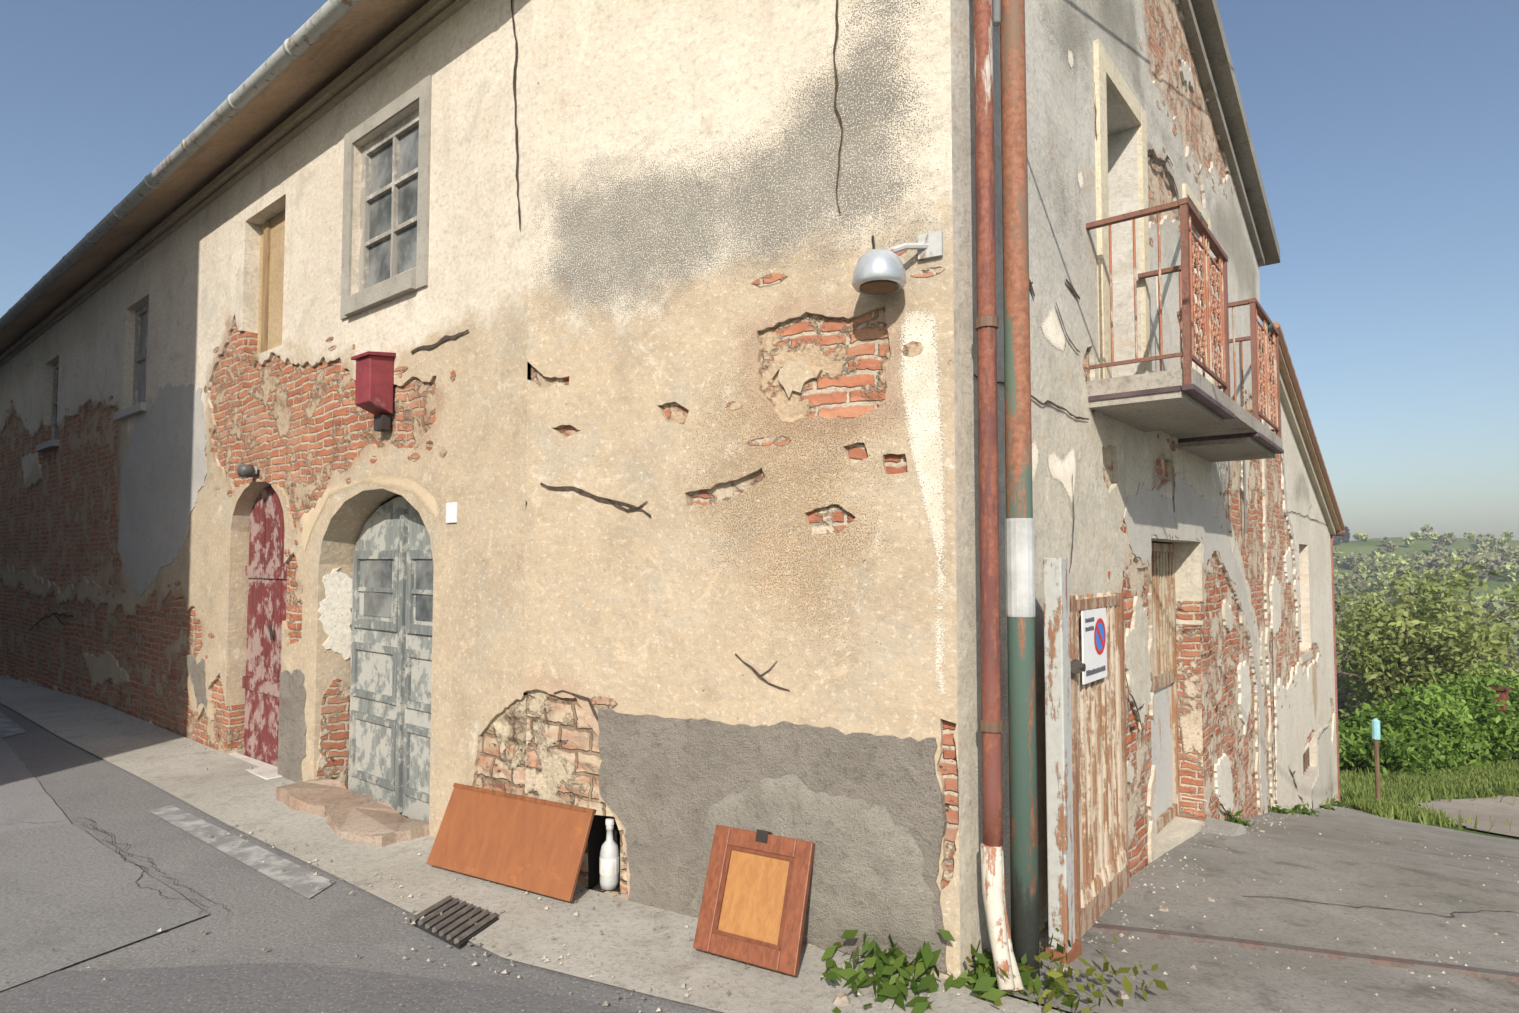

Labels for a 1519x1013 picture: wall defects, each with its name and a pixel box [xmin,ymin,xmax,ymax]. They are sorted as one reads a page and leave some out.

flaking render [1139,0,1236,246]
flaking render [0,392,245,751]
flaking render [204,311,456,660]
flaking render [316,678,350,789]
spalling [475,665,630,899]
spalling [660,403,689,424]
flaking render [688,266,945,506]
crack [973,373,1089,420]
crack [1029,279,1080,352]
crack [1067,474,1075,572]
flaking render [1105,518,1156,877]
flaking render [1176,454,1321,830]